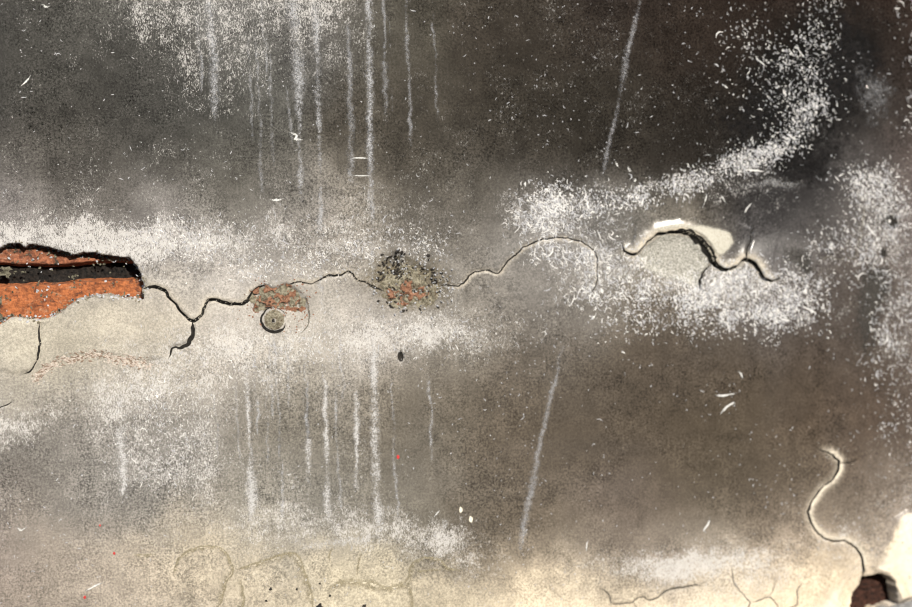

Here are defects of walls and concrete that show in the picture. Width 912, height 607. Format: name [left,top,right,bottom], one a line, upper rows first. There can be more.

spalling [0,239,149,324]
crack [290,271,383,291]
crack [444,236,599,291]
peeling [638,224,733,287]
crack [622,228,783,287]
water stain [500,0,912,472]
crack [24,324,41,374]
crack [144,285,264,359]
water stain [70,207,548,494]
water stain [247,466,257,513]
crack [807,448,865,574]
spalling [815,513,912,607]